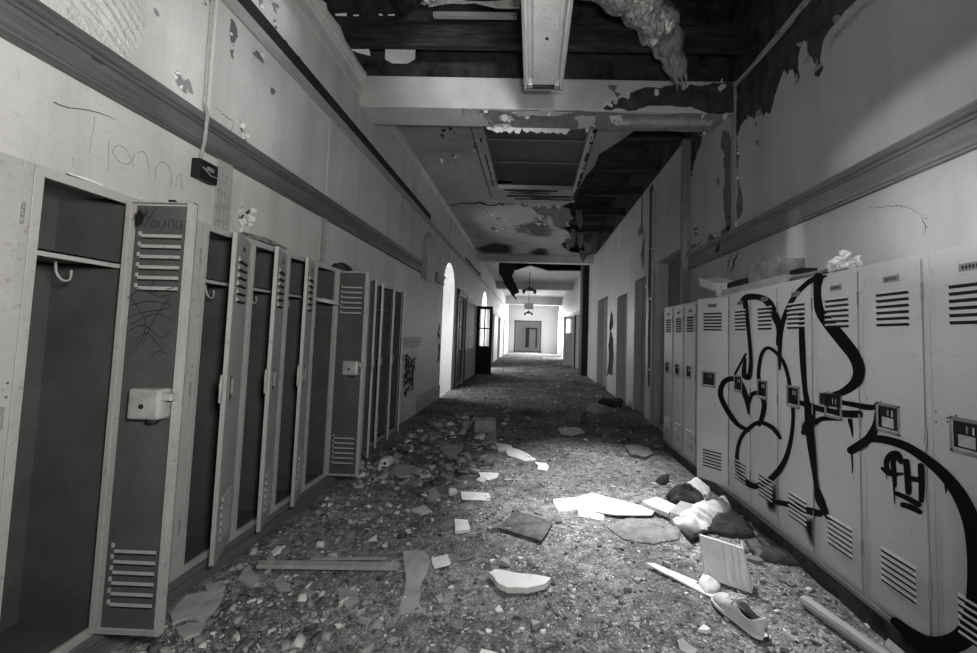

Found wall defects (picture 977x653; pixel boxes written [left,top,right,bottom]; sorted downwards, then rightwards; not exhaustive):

peeling [229,19,238,60]
peeling [258,0,287,42]
peeling [172,70,194,95]
flaking render [462,0,856,250]